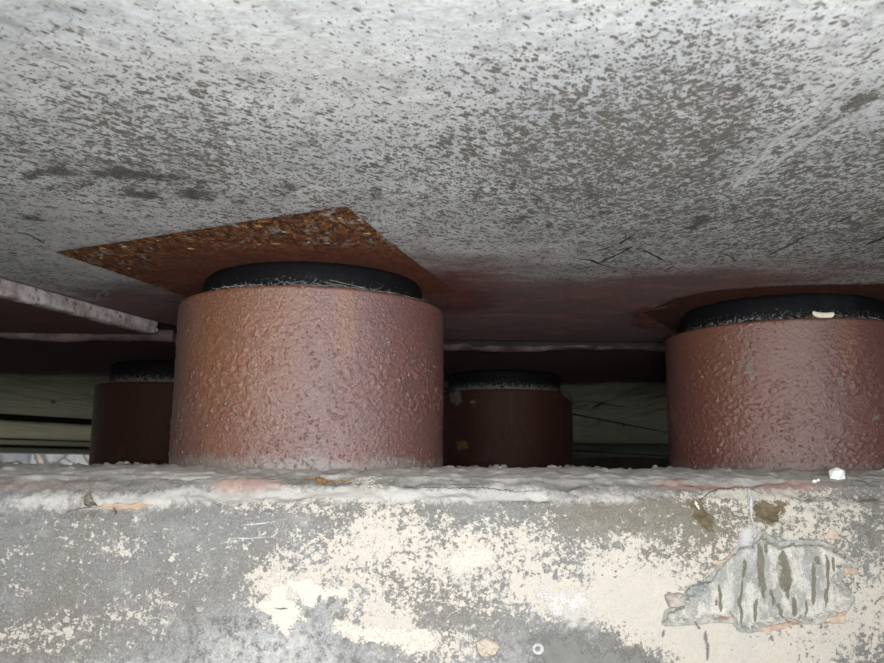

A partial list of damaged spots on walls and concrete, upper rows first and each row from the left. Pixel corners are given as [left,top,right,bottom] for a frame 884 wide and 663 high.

damp [769,101,884,172]
damp [0,161,215,202]
damp [275,181,307,196]
damp [684,214,718,230]
spalling [662,527,861,633]